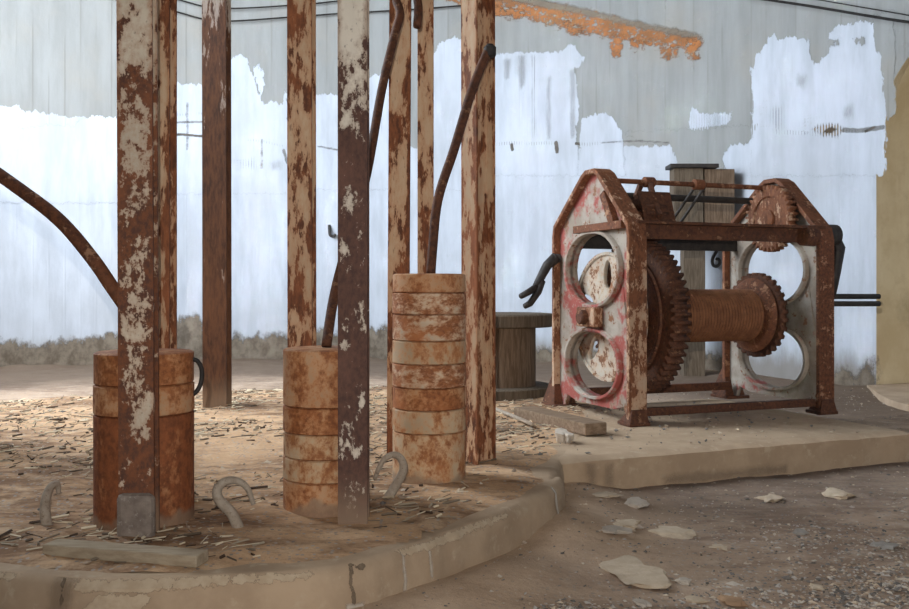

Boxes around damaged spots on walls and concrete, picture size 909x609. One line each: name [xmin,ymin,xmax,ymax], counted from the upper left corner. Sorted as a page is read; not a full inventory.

rust [495,0,702,60]
peeling [177,82,202,195]
peeling [231,54,287,195]
peeling [316,93,338,192]
peeling [369,74,389,191]
peeling [434,36,461,191]
peeling [495,10,897,178]
crack [347,563,365,609]